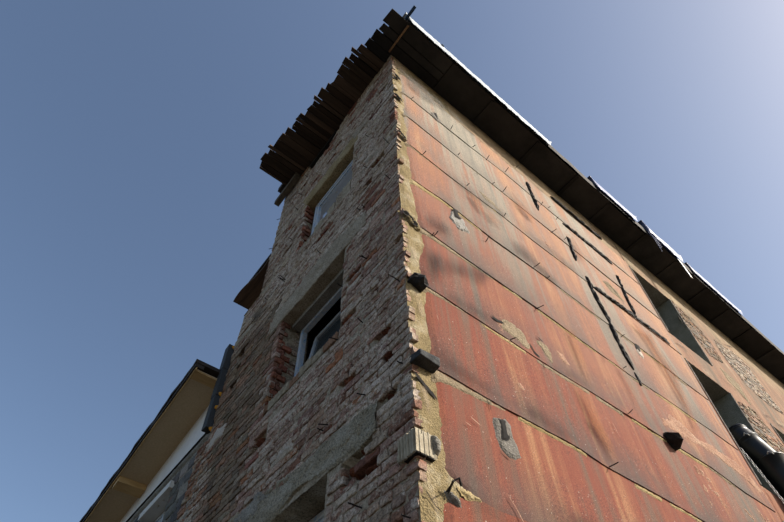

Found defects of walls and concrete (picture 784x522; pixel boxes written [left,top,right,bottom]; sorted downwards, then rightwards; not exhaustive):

spalling [449,208,469,234]
peeling [492,316,570,365]
spalling [492,417,521,460]
peeling [662,414,768,499]